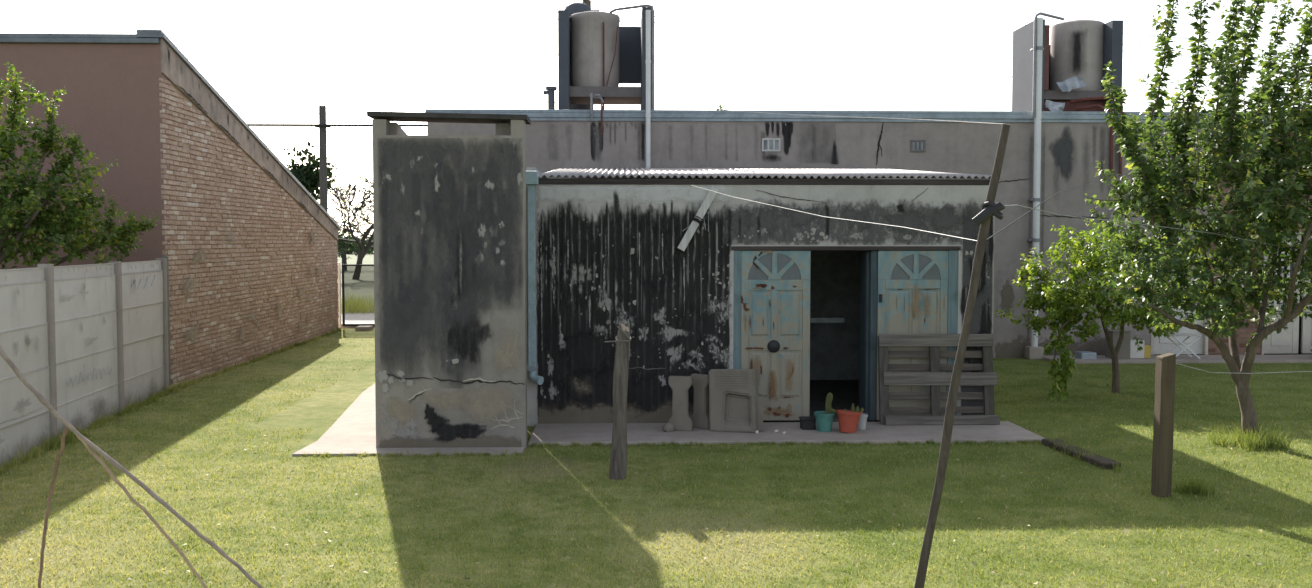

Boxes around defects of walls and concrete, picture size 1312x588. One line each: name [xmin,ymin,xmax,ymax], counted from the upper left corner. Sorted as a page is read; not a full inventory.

leakage [591,122,618,160]
leakage [765,122,793,160]
leakage [1052,129,1073,177]
peeling [539,187,725,201]
leakage [379,140,521,383]
peeling [475,221,506,265]
peeling [550,219,767,385]
leakage [537,193,1105,424]
crack [387,334,524,430]
rust [746,347,794,417]
leakage [380,403,521,448]